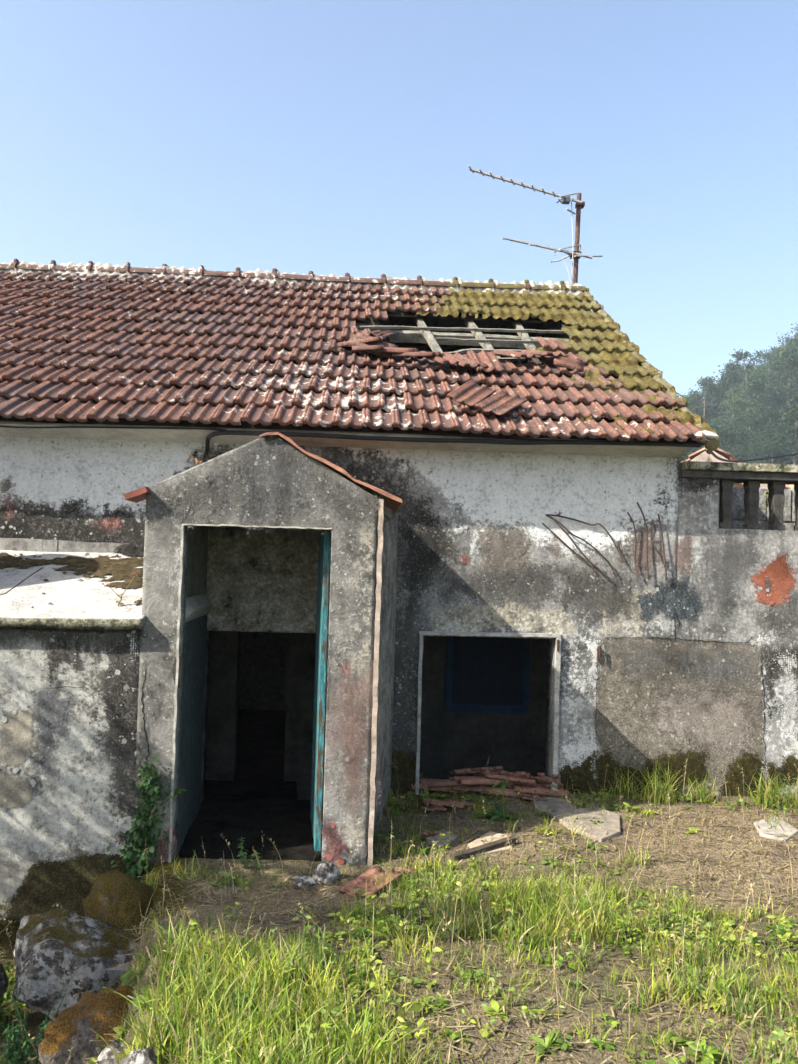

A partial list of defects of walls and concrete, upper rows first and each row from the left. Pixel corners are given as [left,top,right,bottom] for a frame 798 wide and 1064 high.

damp [0,442,798,782]
peeling [750,552,797,608]
damp [0,628,154,858]